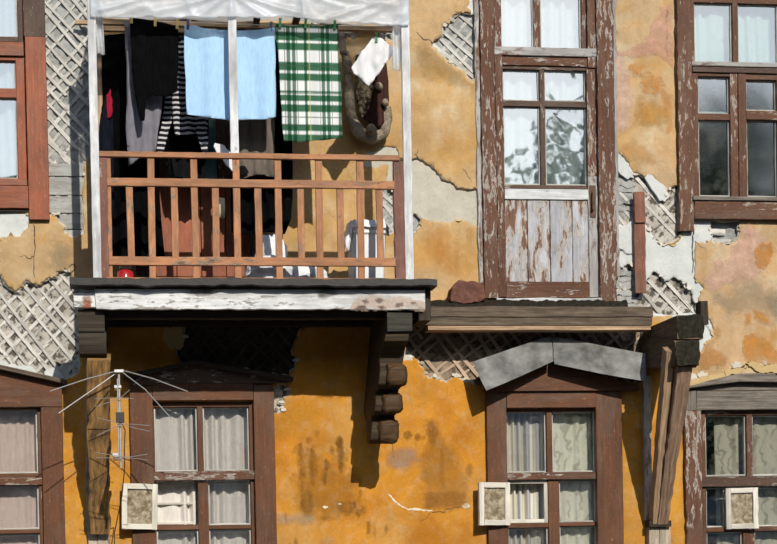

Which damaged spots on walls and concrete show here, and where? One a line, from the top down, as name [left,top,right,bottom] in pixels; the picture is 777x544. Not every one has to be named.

spalling [433,0,480,82]
peeling [363,146,482,233]
crack [400,149,477,191]
peeling [0,212,32,241]
spalling [616,152,739,317]
spalling [0,268,79,379]
spalling [162,327,302,375]
spalling [403,327,641,385]
peeling [699,319,715,352]
spalling [274,385,291,413]
crack [389,494,462,521]